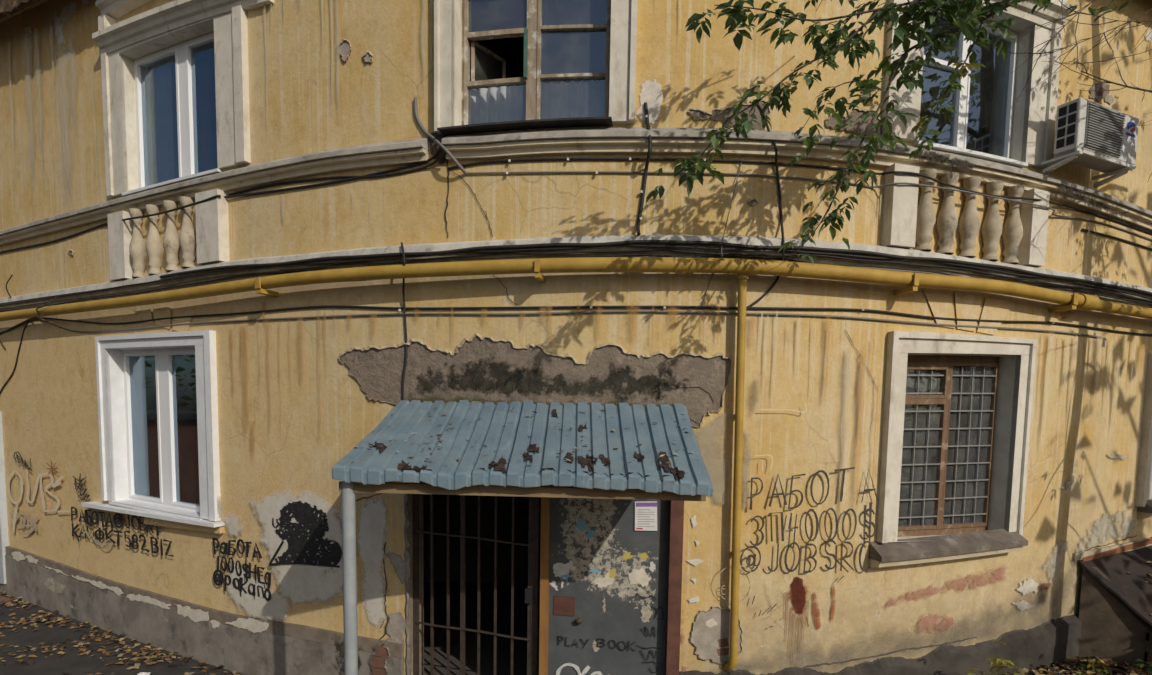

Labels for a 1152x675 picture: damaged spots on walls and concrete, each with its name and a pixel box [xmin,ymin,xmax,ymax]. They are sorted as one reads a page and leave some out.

spalling [337,332,733,429]
peeling [12,551,269,633]
peeling [357,498,406,675]
spalling [681,515,744,672]
corrosion [789,576,835,629]
peeling [885,567,1006,608]
peeling [1012,510,1135,612]